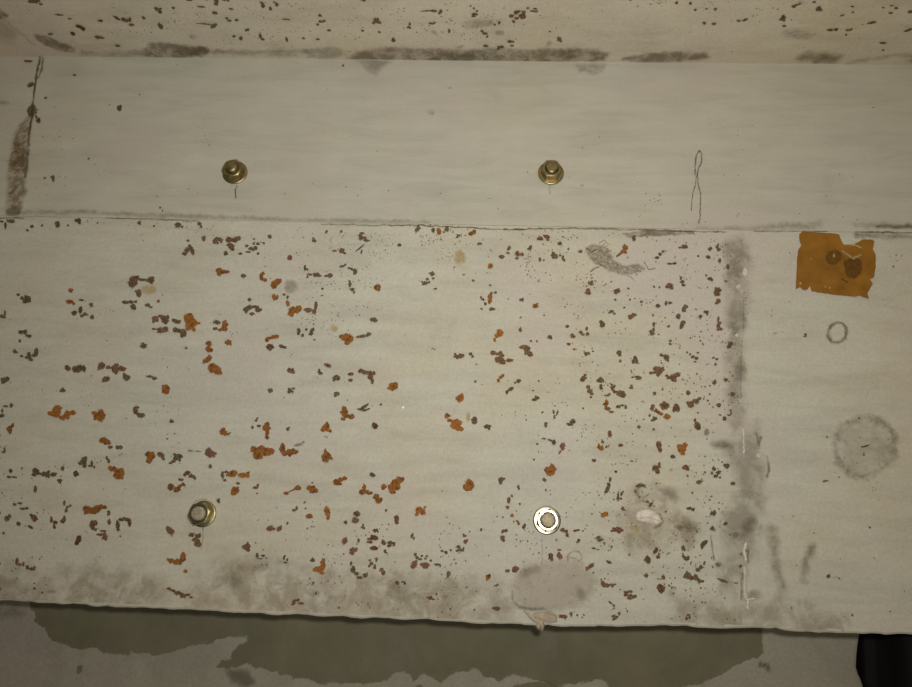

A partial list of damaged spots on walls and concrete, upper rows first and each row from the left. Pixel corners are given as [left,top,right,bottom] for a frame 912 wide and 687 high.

damp [148,44,208,58]
damp [355,49,394,60]
damp [405,50,503,61]
damp [520,49,606,61]
damp [626,53,707,63]
corrosion [259,272,318,317]
corrosion [152,313,201,338]
corrosion [580,374,626,413]
corrosion [650,397,701,420]
corrosion [250,422,299,460]
corrosion [359,476,405,504]
corrosion [83,504,131,541]